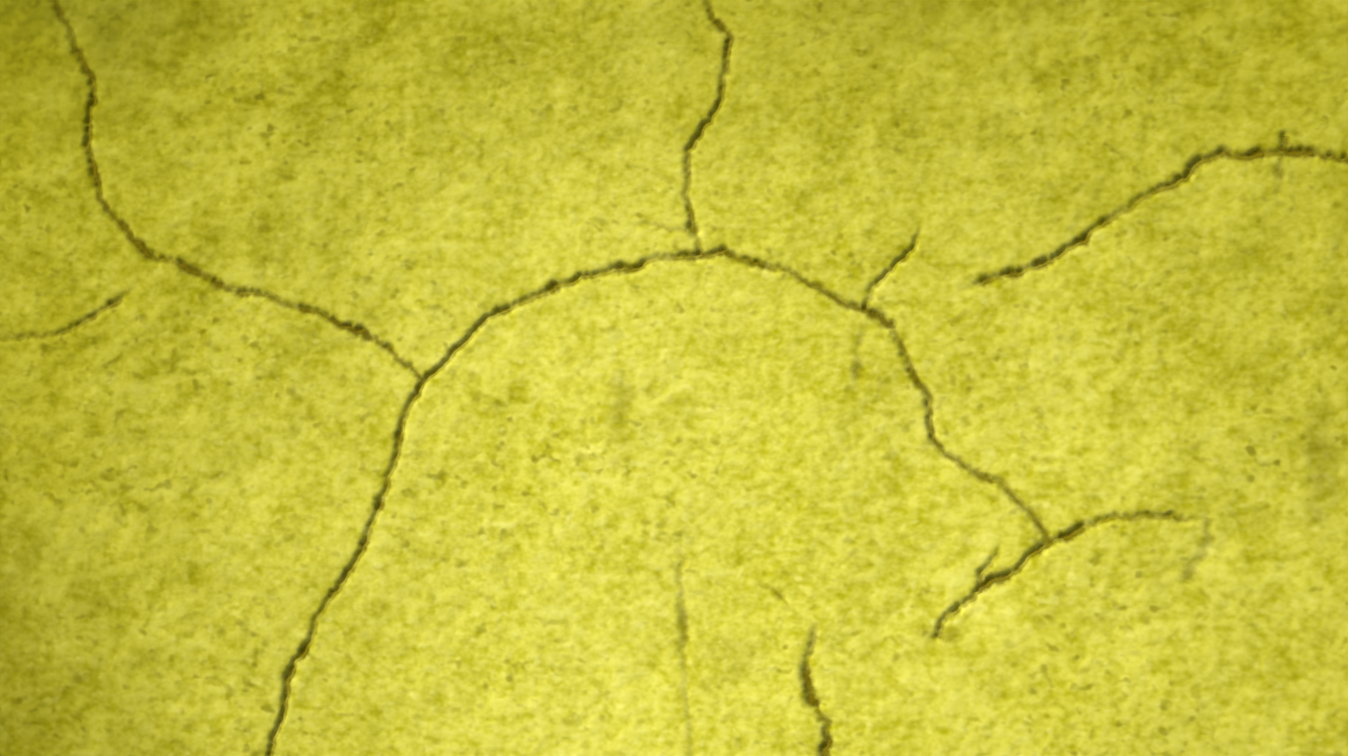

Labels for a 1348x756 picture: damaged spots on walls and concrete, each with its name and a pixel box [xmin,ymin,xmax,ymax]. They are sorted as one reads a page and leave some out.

crack [54,1,1112,756]
crack [1159,136,1348,190]